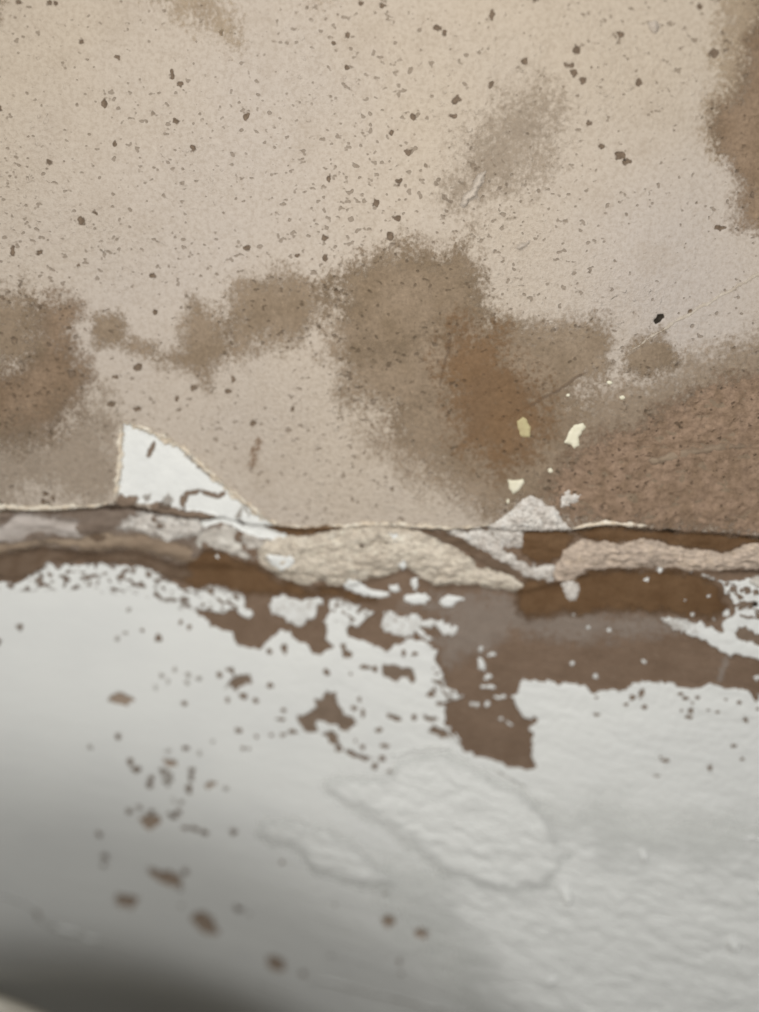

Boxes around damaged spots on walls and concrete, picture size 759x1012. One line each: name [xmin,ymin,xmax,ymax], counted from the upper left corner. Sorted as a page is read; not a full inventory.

water stain [711,23,759,230]
water stain [0,289,94,448]
water stain [92,240,759,564]
crack [654,529,759,538]
peeling [0,373,759,775]
crack [719,567,759,575]
peeling [128,750,177,788]
peeling [127,768,208,835]
peeling [147,868,188,888]
peeling [116,894,138,909]
peeling [191,911,220,935]
peeling [267,955,285,972]